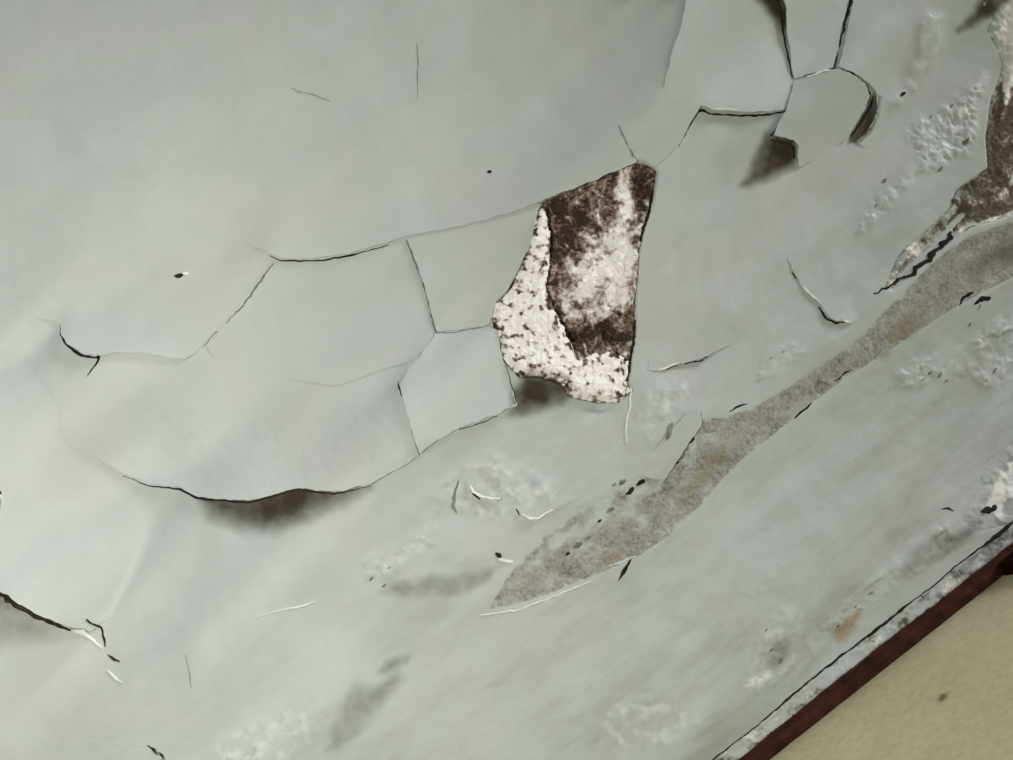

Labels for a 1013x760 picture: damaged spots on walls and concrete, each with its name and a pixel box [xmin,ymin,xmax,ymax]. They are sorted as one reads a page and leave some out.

crack [804,0,871,94]
crack [203,263,274,347]
crack [406,240,489,333]
peeling [0,0,961,635]
crack [665,356,708,370]
crack [665,423,673,441]
crack [451,481,459,513]
crack [618,559,631,581]
spalling [717,442,1013,760]